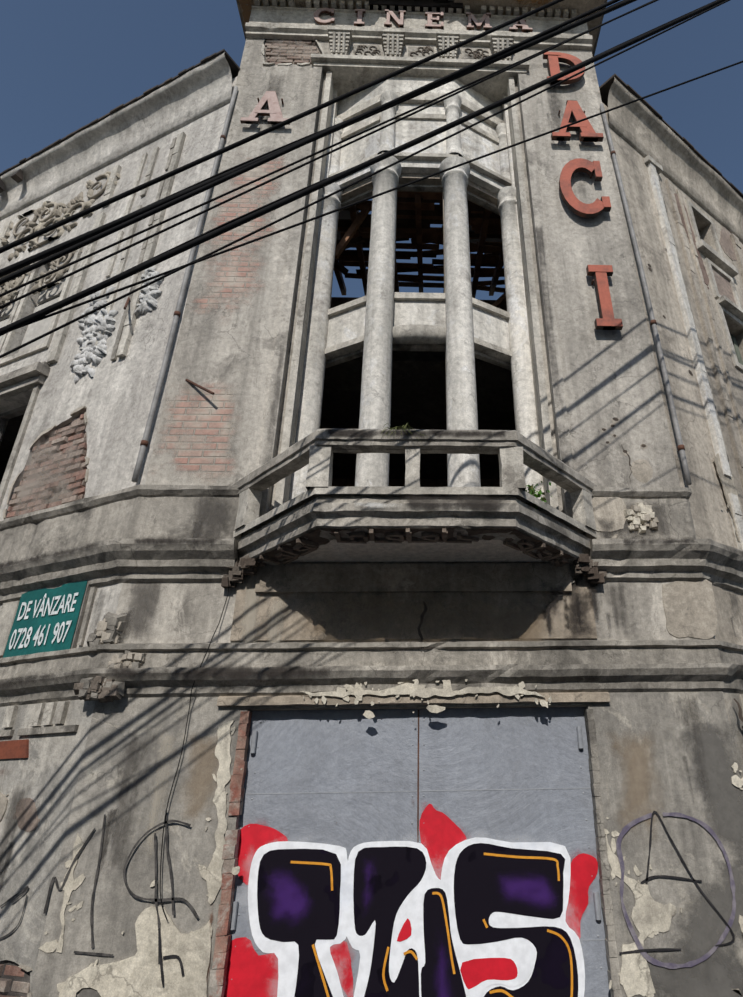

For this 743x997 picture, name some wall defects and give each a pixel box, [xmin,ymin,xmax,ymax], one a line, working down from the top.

spalling [3,406,90,519]
crack [417,601,431,650]
flaking render [301,679,552,719]
spalling [0,791,40,832]
flaking render [198,720,242,904]
flaking render [731,762,743,790]
spalling [0,960,32,997]
flaking render [38,834,86,953]
flaking render [57,905,213,997]
flaking render [604,817,682,997]